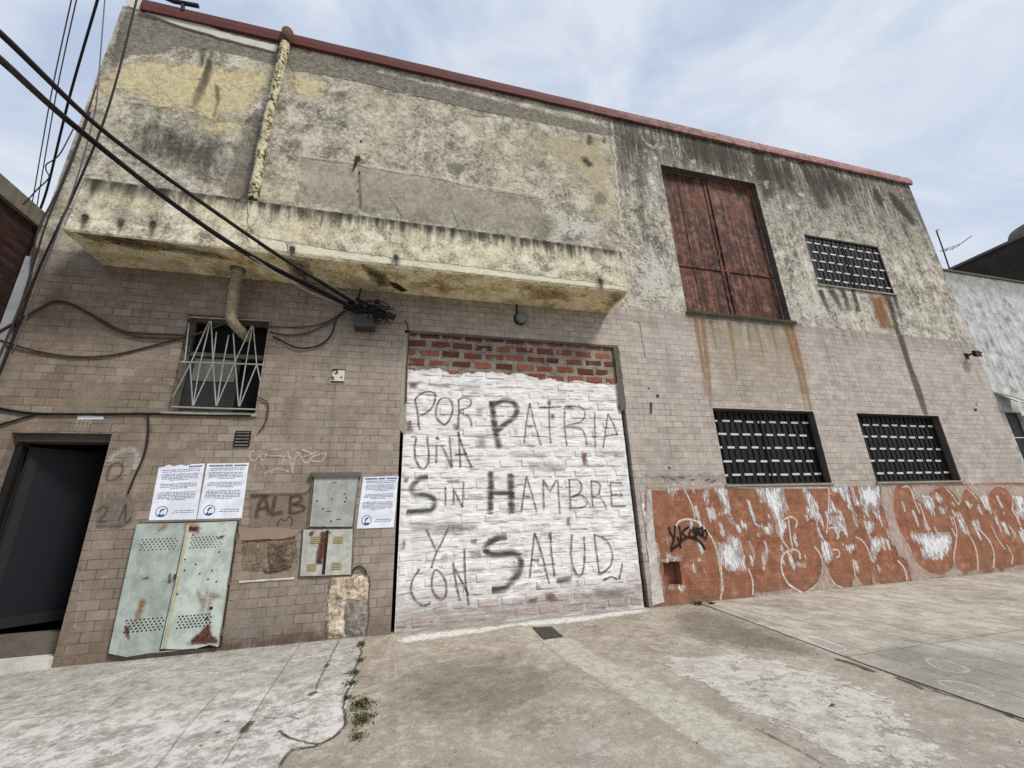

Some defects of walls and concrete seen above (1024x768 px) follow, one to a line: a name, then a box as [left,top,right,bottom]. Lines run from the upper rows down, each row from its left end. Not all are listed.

peeling [99,56,271,136]
leakage [198,193,301,209]
leakage [874,189,914,224]
leakage [376,217,587,248]
rust [872,297,892,328]
rust [694,318,714,365]
rust [772,326,805,377]
rust [190,606,217,644]
flaking render [324,574,370,638]